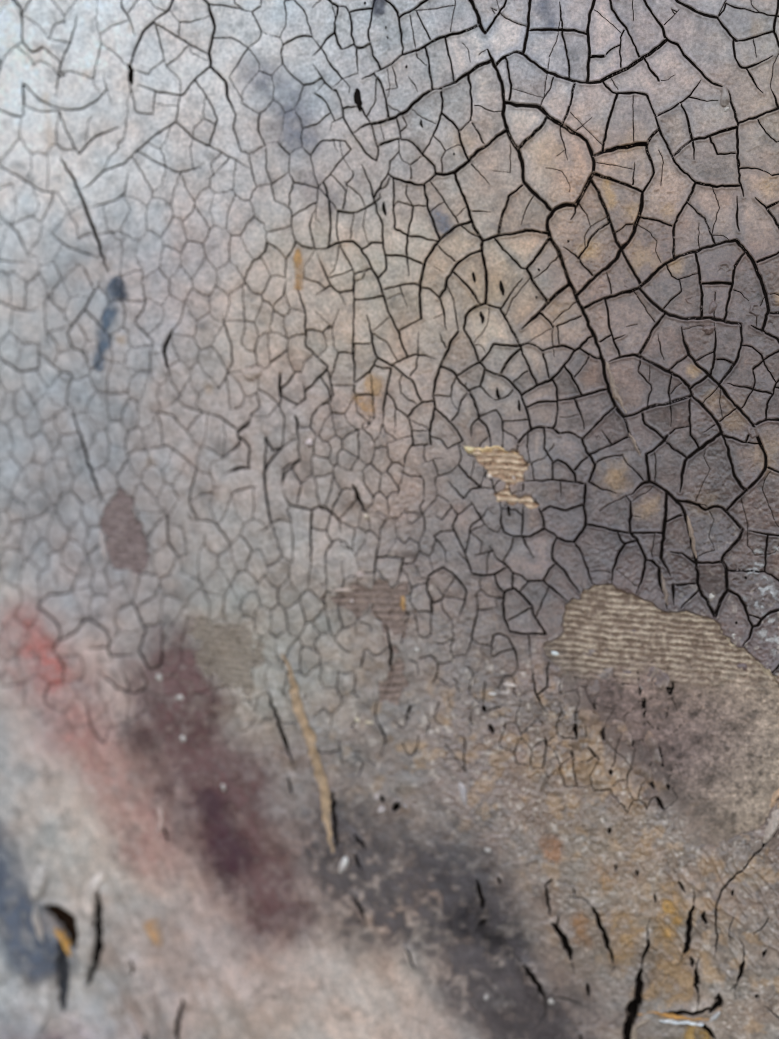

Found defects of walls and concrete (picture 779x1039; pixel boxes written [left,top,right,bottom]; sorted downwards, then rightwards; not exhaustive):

crack [0,0,252,208]
crack [0,217,27,263]
crack [0,231,119,408]
crack [135,280,152,341]
crack [143,0,779,717]
peeling [464,446,539,509]
crack [37,575,163,712]
peeling [545,584,779,842]
leakage [0,845,61,979]
crack [677,847,769,1009]